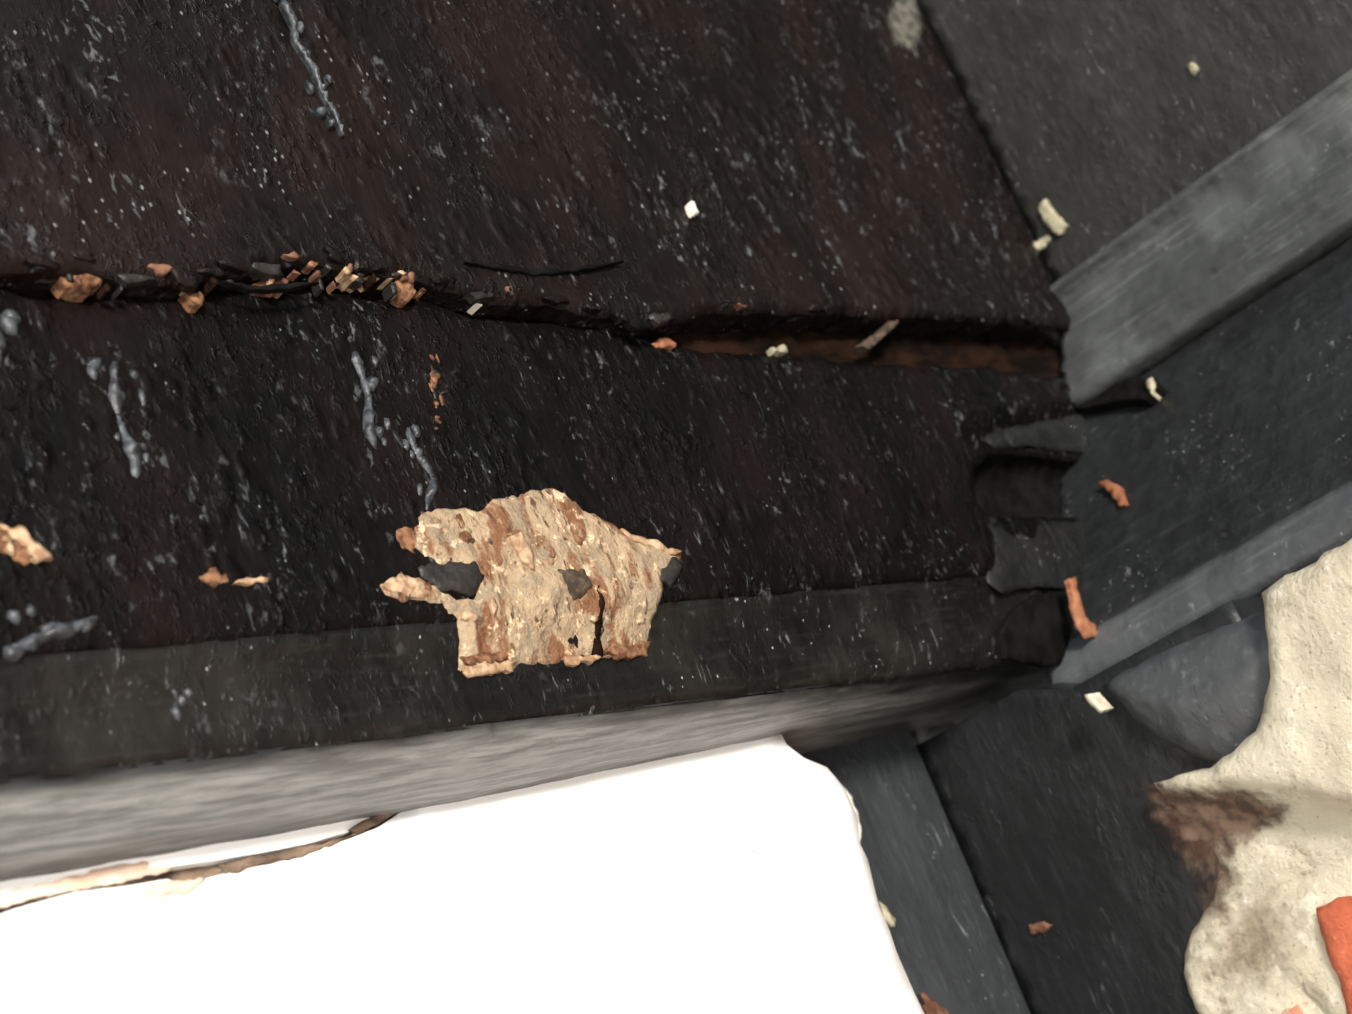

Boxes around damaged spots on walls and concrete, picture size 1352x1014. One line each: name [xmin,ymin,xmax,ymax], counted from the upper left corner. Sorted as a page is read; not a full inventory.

crack [22,247,1064,379]
peeling [0,523,54,565]
peeling [380,488,683,678]